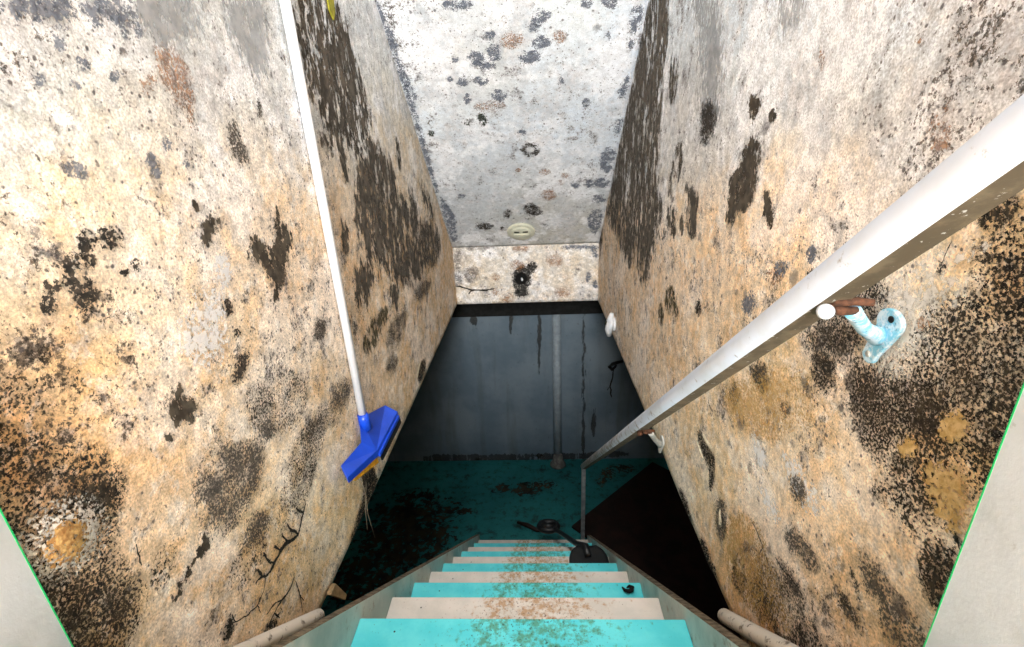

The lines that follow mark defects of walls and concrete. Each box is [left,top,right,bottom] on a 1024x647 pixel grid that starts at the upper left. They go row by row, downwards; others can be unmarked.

leakage [446,30,507,105]
leakage [517,8,553,64]
leakage [376,0,494,285]
leakage [562,146,617,257]
leakage [30,220,125,317]
leakage [363,277,431,375]
leakage [170,252,352,597]
leakage [723,197,1024,611]
leakage [0,346,183,647]
crack [230,503,306,624]
leakage [723,488,823,647]
leakage [835,551,926,647]